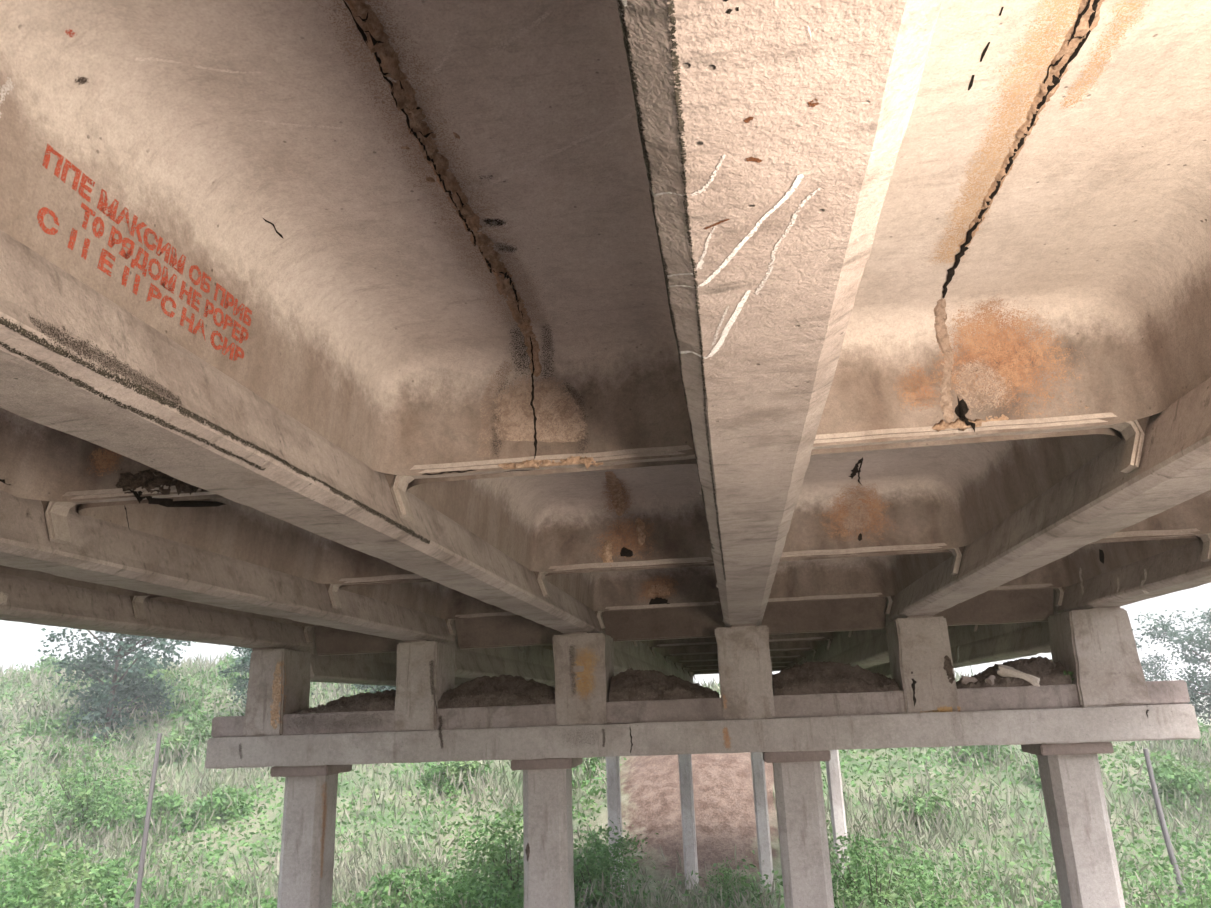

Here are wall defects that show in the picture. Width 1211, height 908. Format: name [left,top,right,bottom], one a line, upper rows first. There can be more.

leakage [0,77,15,118]
crack [319,0,550,334]
crack [928,0,1150,298]
leakage [477,324,589,469]
spalling [115,468,225,531]
rust [589,471,666,563]